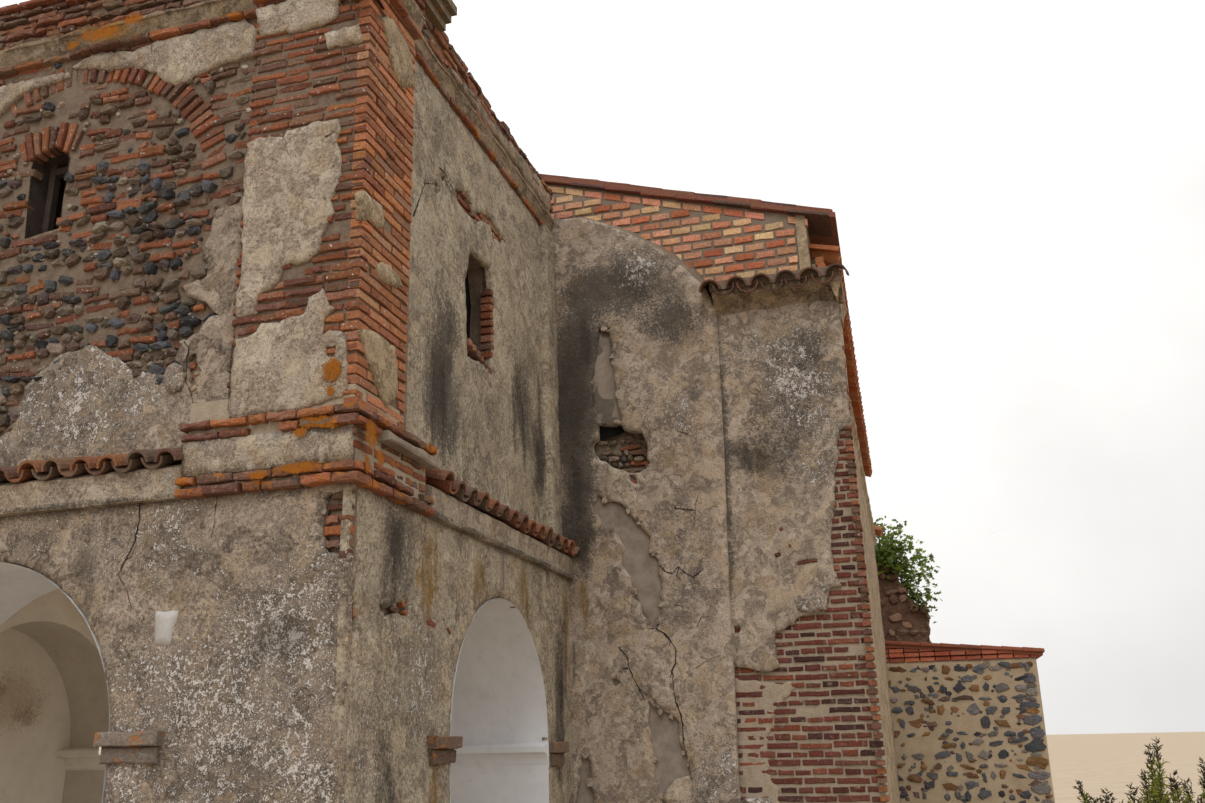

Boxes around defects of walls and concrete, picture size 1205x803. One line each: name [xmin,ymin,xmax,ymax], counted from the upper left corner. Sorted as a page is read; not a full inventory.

peeling [379,16,414,88]
spalling [0,0,398,467]
peeling [374,262,403,288]
crack [118,503,143,604]
peeling [590,381,666,629]
crack [618,565,721,757]
spalling [734,345,890,803]